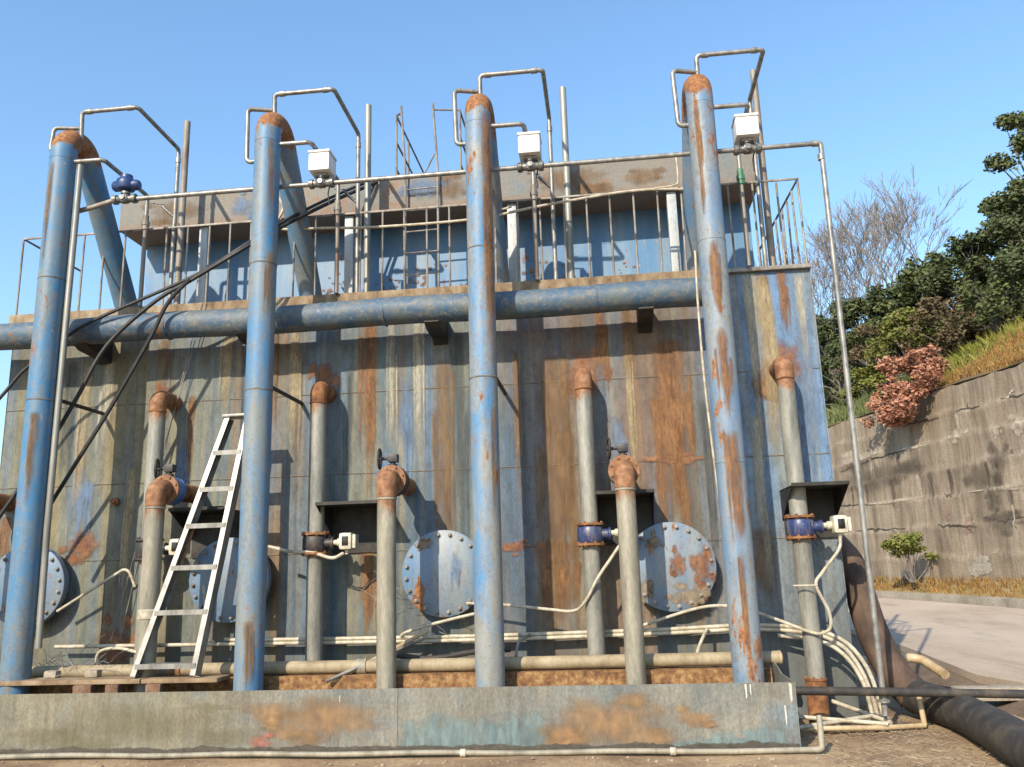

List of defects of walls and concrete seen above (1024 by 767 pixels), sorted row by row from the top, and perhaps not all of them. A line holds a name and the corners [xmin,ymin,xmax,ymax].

corrosion [709,244,722,306]
corrosion [758,271,791,322]
corrosion [358,326,376,453]
corrosion [714,330,734,401]
corrosion [502,313,612,608]
corrosion [642,341,707,518]
corrosion [58,533,97,564]
corrosion [723,432,776,641]
corrosion [360,552,377,623]
corrosion [251,703,366,744]
corrosion [547,695,667,745]